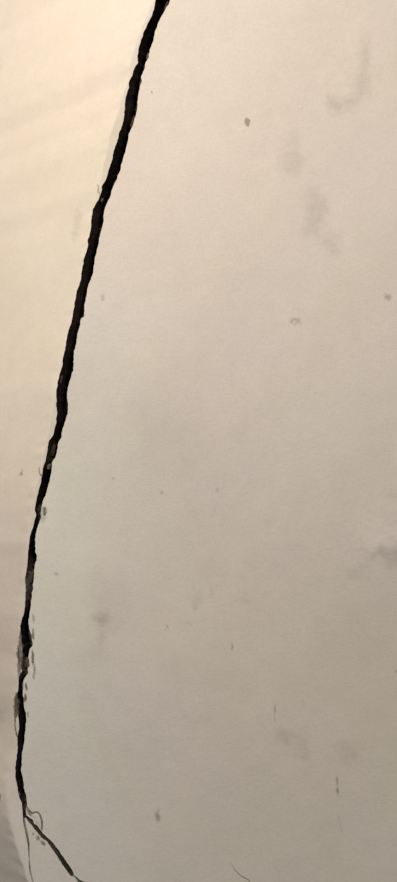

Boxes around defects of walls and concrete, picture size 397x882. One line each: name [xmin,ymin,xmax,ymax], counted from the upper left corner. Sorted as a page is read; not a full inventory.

crack [15,0,170,882]